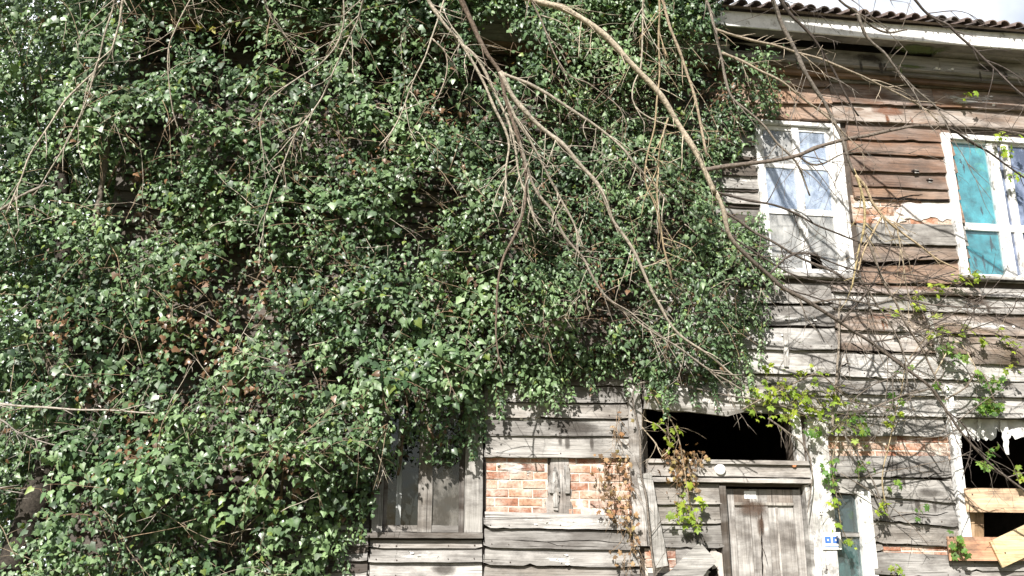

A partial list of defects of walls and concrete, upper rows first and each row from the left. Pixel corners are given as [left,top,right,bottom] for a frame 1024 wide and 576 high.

flaking render [850,195,952,225]
flaking render [485,457,632,526]